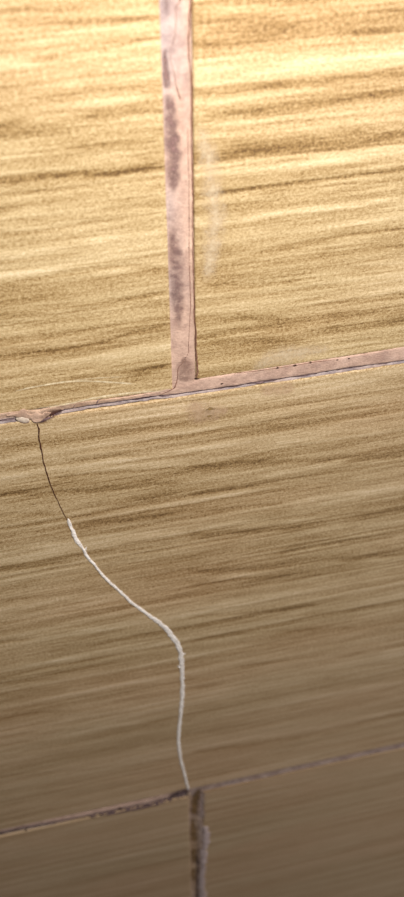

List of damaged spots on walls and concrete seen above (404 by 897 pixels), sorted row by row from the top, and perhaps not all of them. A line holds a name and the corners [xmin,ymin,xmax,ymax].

crack [0,396,189,834]